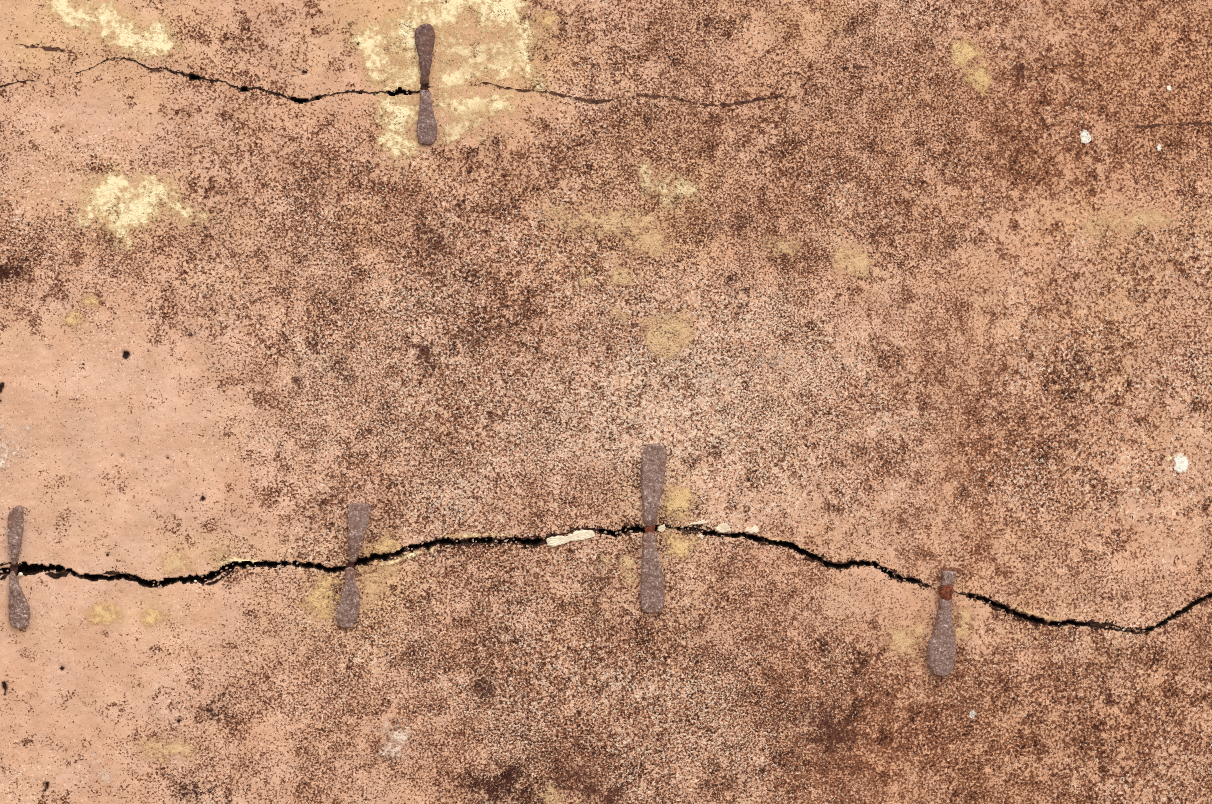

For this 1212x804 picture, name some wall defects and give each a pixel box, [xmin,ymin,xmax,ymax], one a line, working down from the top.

crack [16,42,433,104]
crack [467,82,783,107]
crack [833,63,869,71]
crack [0,520,1212,635]